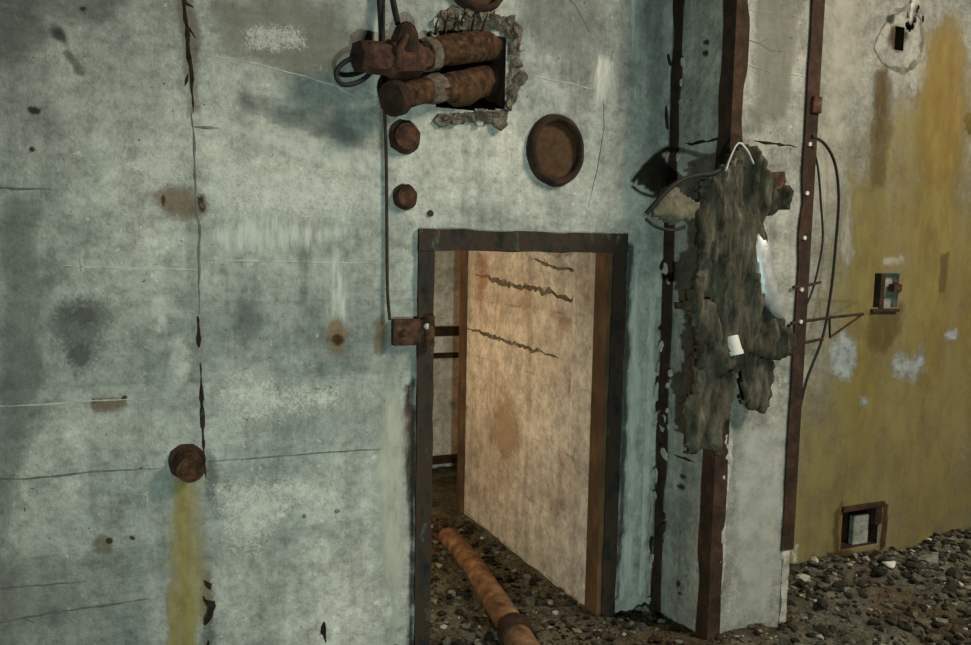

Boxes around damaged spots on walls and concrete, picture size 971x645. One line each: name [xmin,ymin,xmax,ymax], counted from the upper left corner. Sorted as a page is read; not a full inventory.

spalling [429,6,529,131]
water stain [752,0,801,126]
corrosion [156,189,207,217]
crack [182,0,382,477]
corrosion [329,314,346,351]
crack [467,328,558,358]
crack [475,258,574,303]
peeling [653,326,673,432]
water stain [789,0,971,566]
crack [0,468,160,480]
water stain [209,465,348,559]
water stain [733,427,783,624]